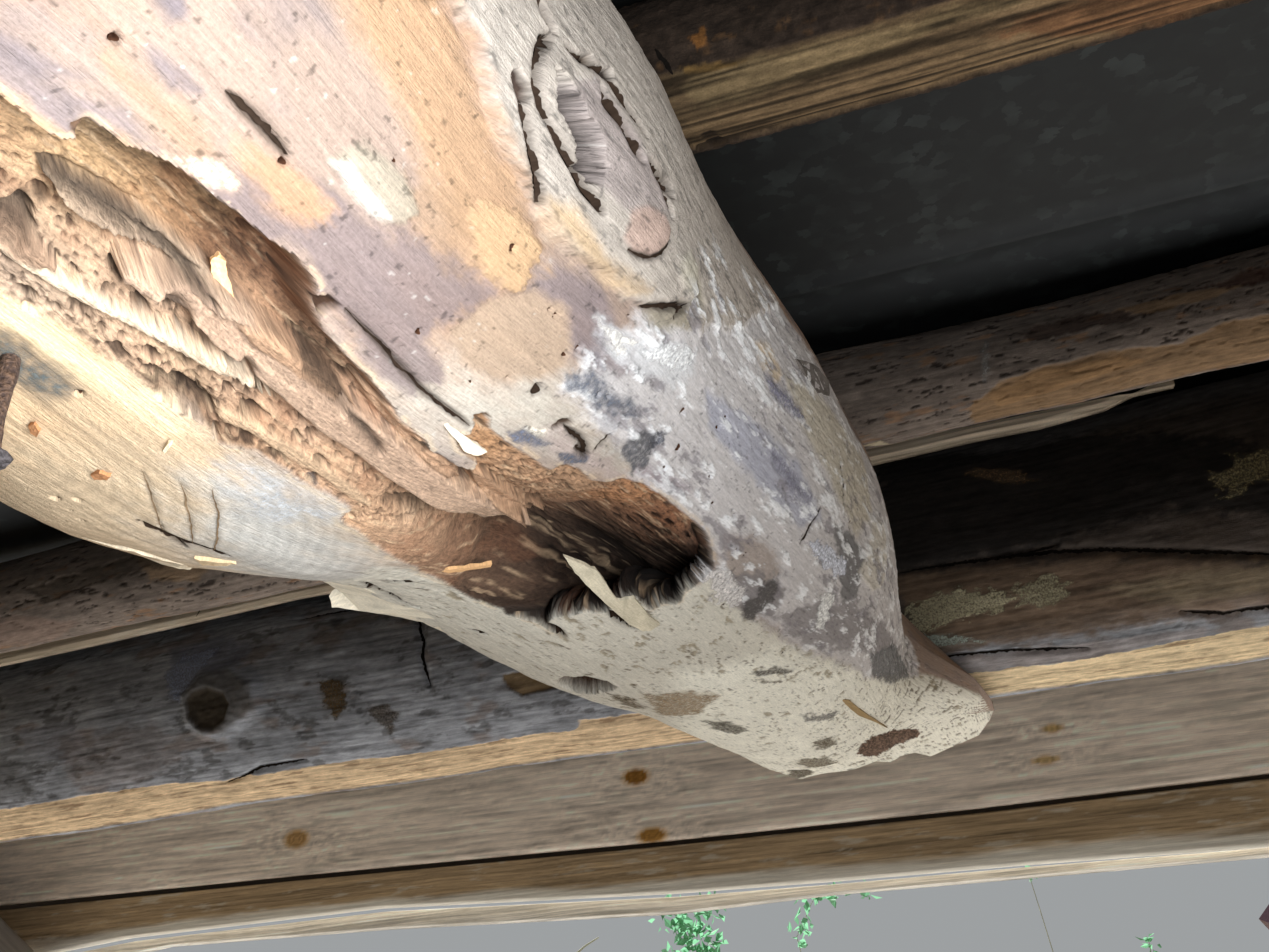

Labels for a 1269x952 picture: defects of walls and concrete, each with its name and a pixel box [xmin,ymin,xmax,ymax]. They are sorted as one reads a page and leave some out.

crack [655,48,673,75]
crack [226,91,288,155]
crack [517,0,668,212]
crack [628,241,669,258]
spalling [0,93,745,633]
crack [138,469,230,556]